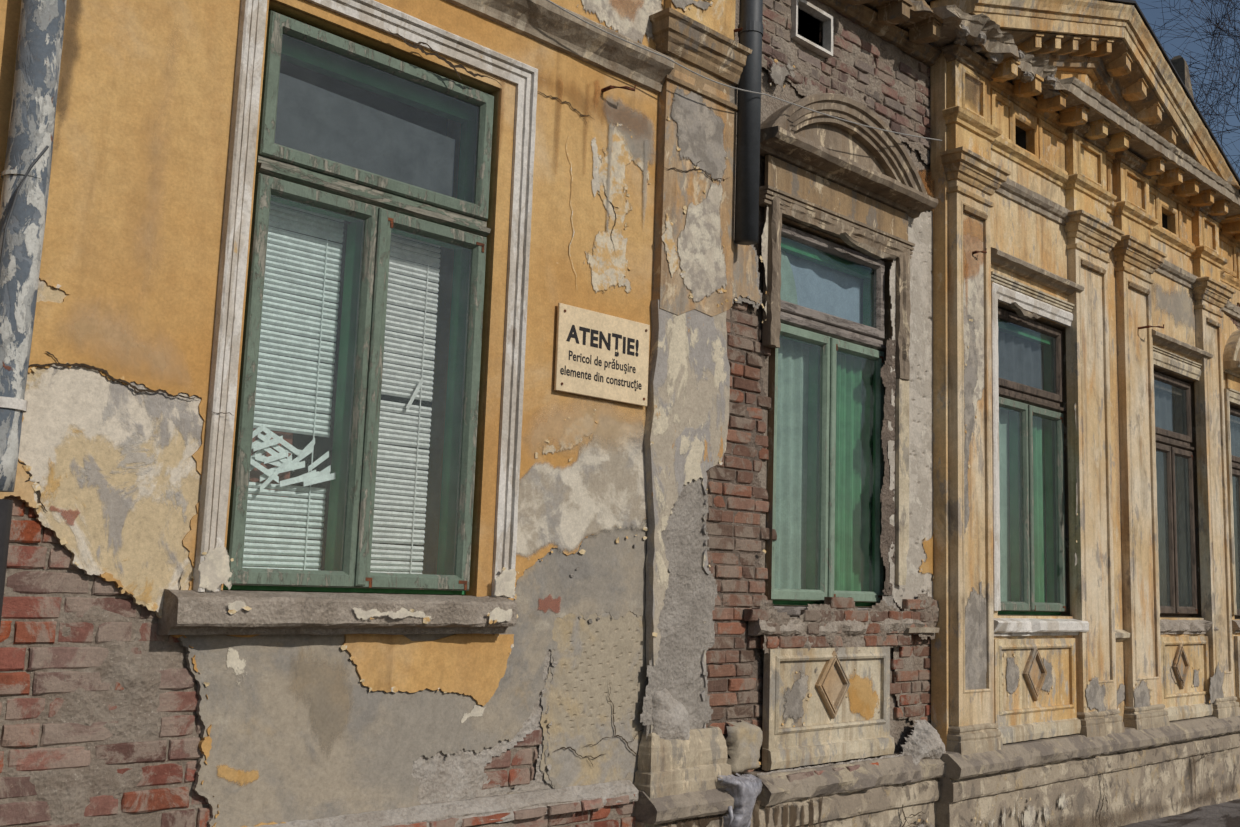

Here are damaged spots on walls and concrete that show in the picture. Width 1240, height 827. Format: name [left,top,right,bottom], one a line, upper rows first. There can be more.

peeling [578,0,713,45]
crack [29,351,232,415]
peeling [0,86,939,827]